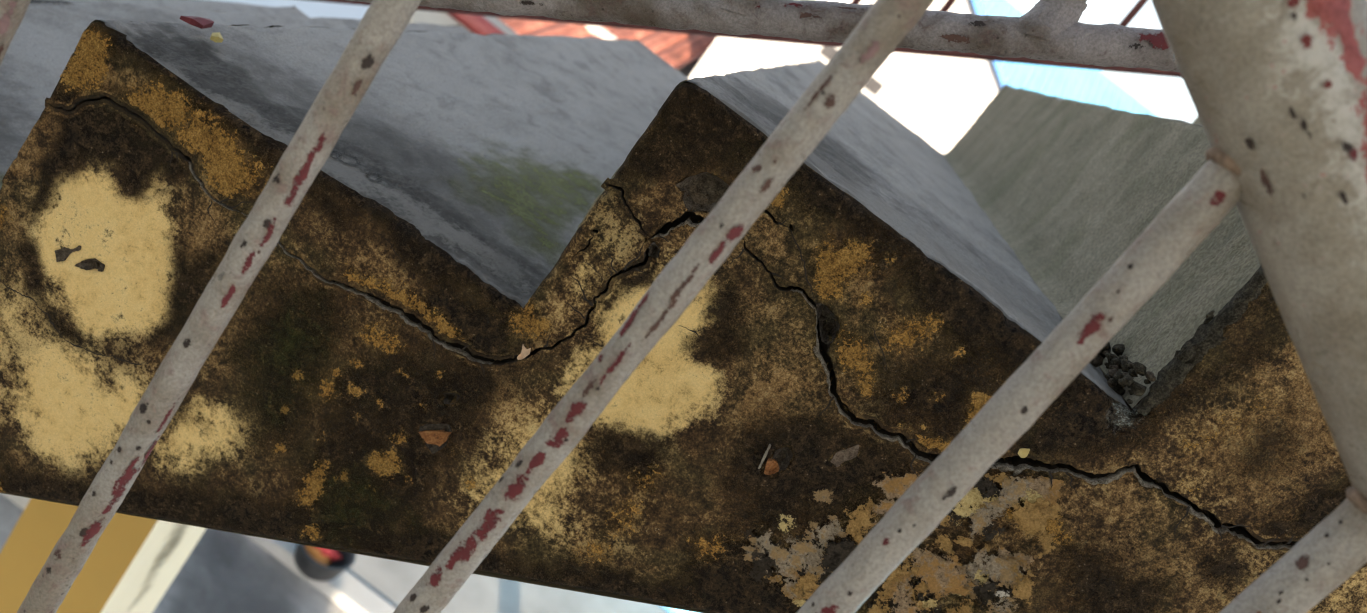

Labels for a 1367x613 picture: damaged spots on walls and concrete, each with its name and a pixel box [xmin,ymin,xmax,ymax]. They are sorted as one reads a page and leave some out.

damp [0,67,186,343]
crack [45,92,254,225]
damp [88,22,288,172]
crack [277,178,713,375]
crack [731,207,941,477]
damp [786,163,1042,435]
spalling [1076,265,1268,416]
damp [0,430,97,505]
damp [476,397,918,613]
peeling [741,466,924,613]
peeling [867,472,1064,613]
crack [989,452,1302,552]